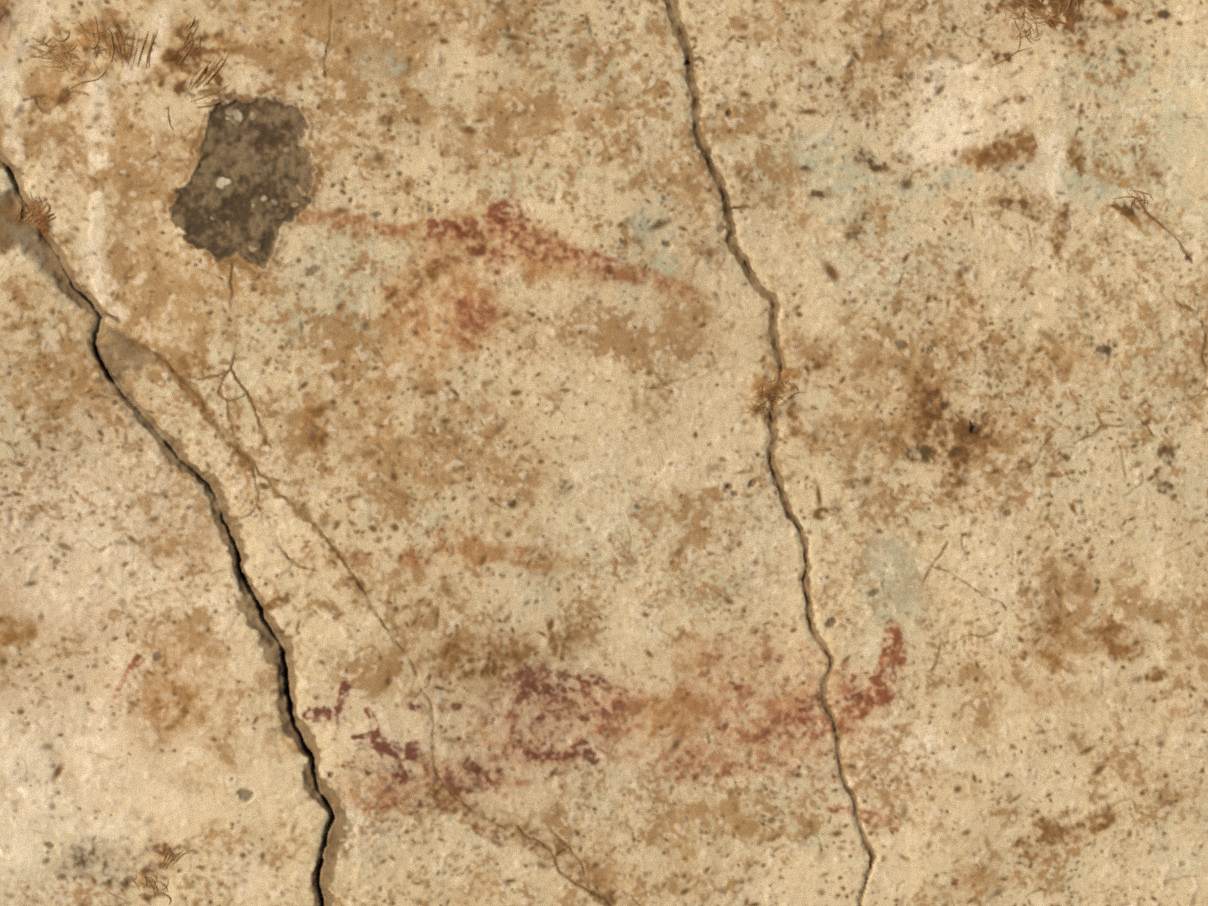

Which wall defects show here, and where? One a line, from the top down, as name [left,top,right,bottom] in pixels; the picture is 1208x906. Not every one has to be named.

crack [0,148,30,205]
crack [94,141,105,149]
spalling [160,83,328,278]
crack [662,0,787,363]
crack [13,234,683,906]
crack [765,428,877,906]